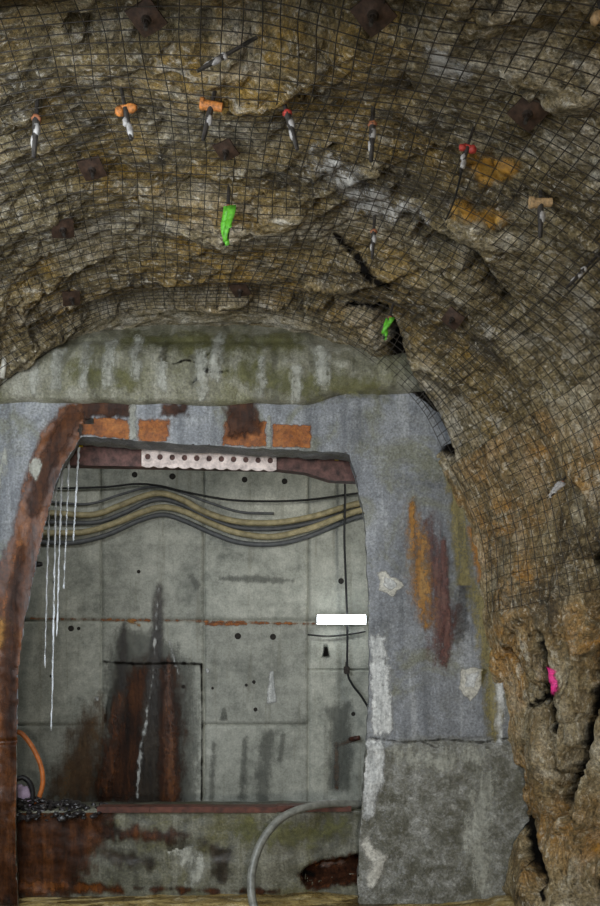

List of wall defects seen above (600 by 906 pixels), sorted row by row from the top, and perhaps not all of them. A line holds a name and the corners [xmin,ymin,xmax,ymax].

water stain [50,348,66,389]
water stain [80,342,90,388]
water stain [102,339,118,386]
water stain [131,335,144,379]
water stain [195,332,224,401]
water stain [255,357,266,395]
water stain [291,366,301,400]
water stain [315,345,331,385]
corrosion [222,403,312,448]
corrosion [407,479,498,740]
corrosion [0,403,191,906]
corrosion [239,887,280,895]